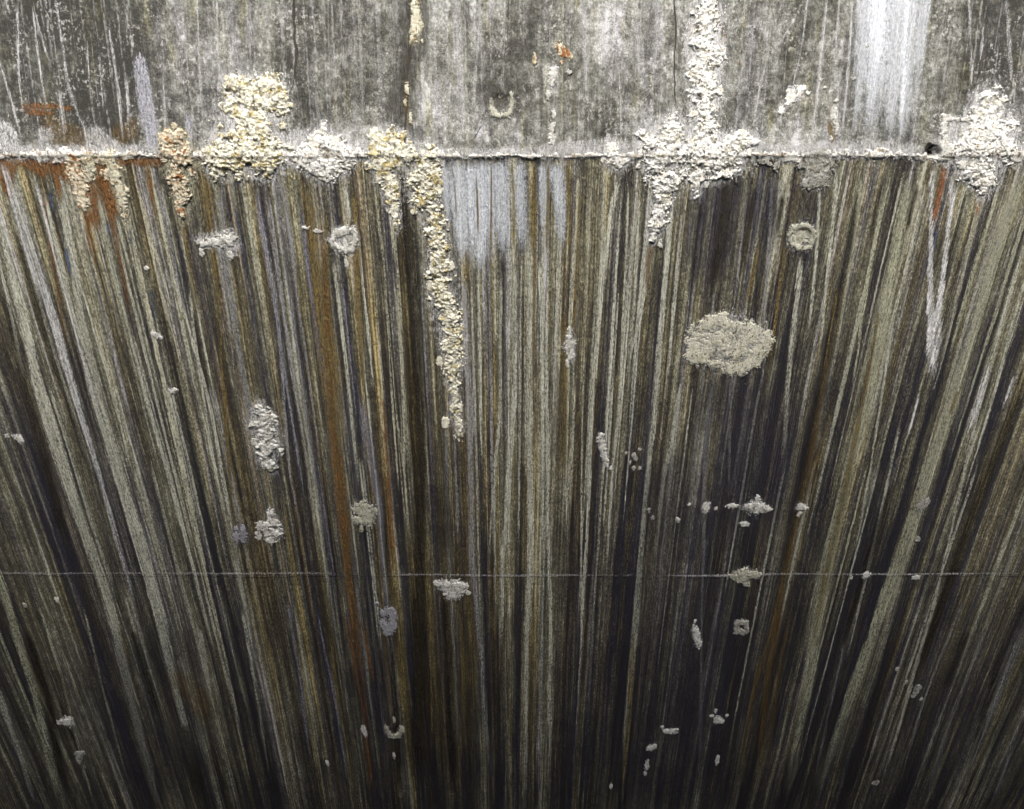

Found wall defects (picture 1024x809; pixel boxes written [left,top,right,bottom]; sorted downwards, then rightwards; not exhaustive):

rust [0,154,194,297]
damp [0,169,203,789]
damp [162,189,242,553]
damp [195,177,329,559]
damp [301,187,399,636]
damp [550,167,579,524]
damp [669,216,682,365]
damp [679,364,785,709]
damp [775,184,864,615]
damp [791,179,925,754]
damp [846,0,928,117]
damp [889,215,1024,760]